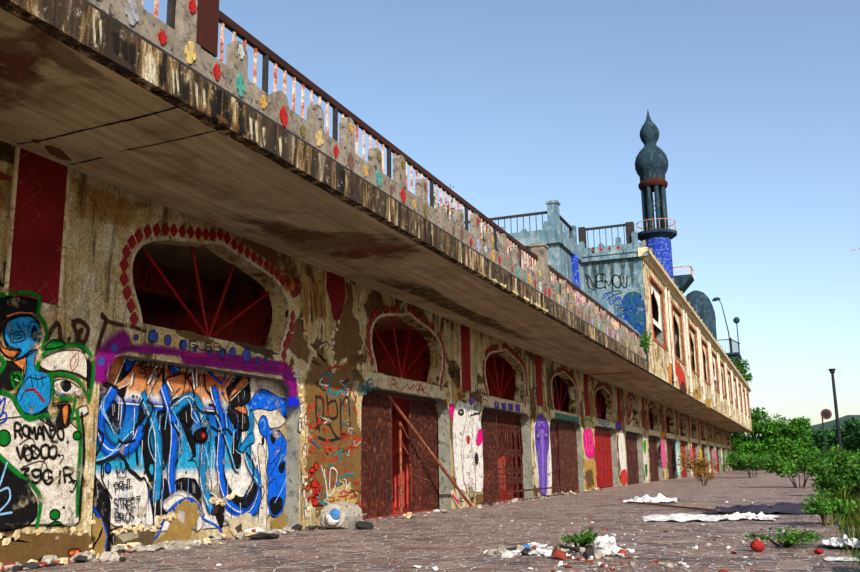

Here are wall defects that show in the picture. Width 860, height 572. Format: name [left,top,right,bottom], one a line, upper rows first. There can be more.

leakage [0,28,99,102]
crack [17,107,177,144]
crack [124,130,216,151]
leakage [236,219,401,292]
leakage [376,280,527,339]
leakage [480,272,548,314]
leakage [583,259,634,291]
flaking render [233,340,279,360]
flaking render [287,283,363,521]
flaking render [209,491,235,506]
flaking render [0,499,200,569]
flaking render [228,512,286,536]